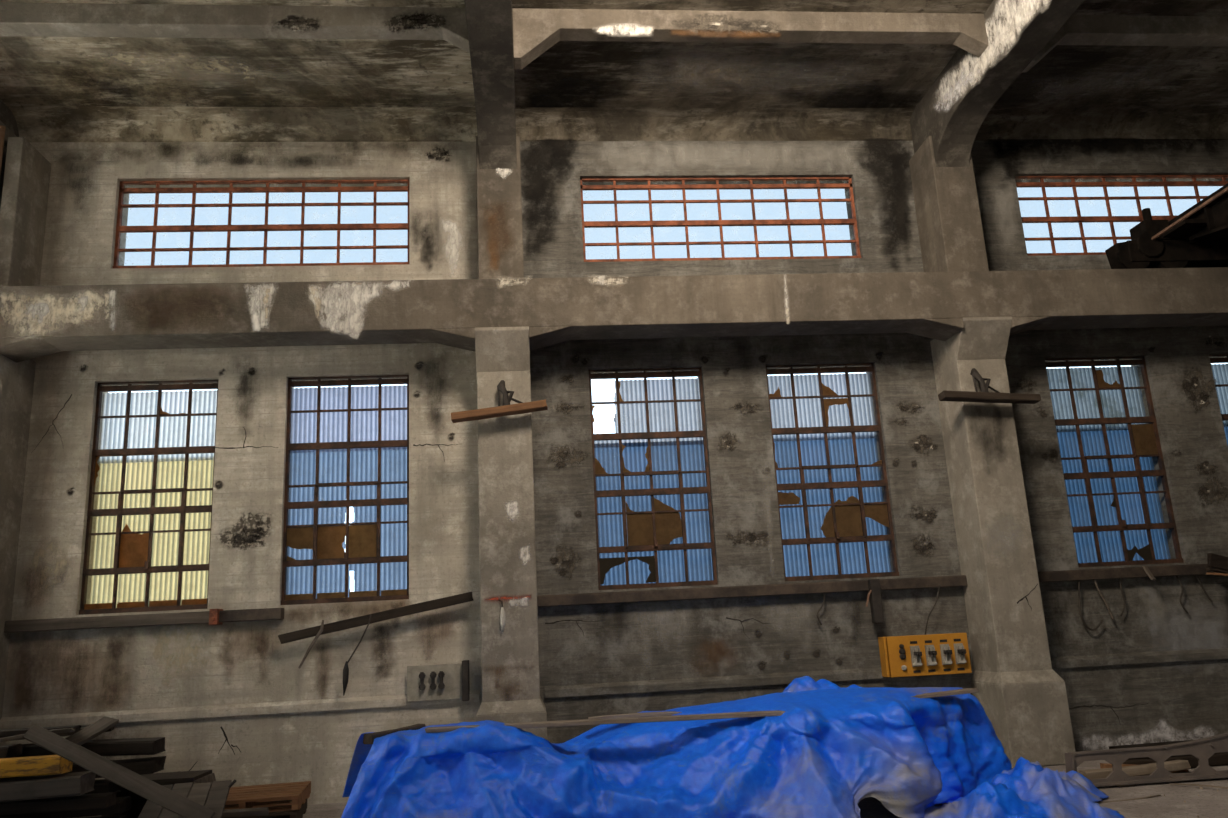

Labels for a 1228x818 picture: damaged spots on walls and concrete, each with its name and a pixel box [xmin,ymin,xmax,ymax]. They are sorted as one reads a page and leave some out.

water stain [830,95,875,108]
water stain [521,150,545,228]
water stain [890,154,908,242]
water stain [443,222,461,269]
peeling [1,291,104,335]